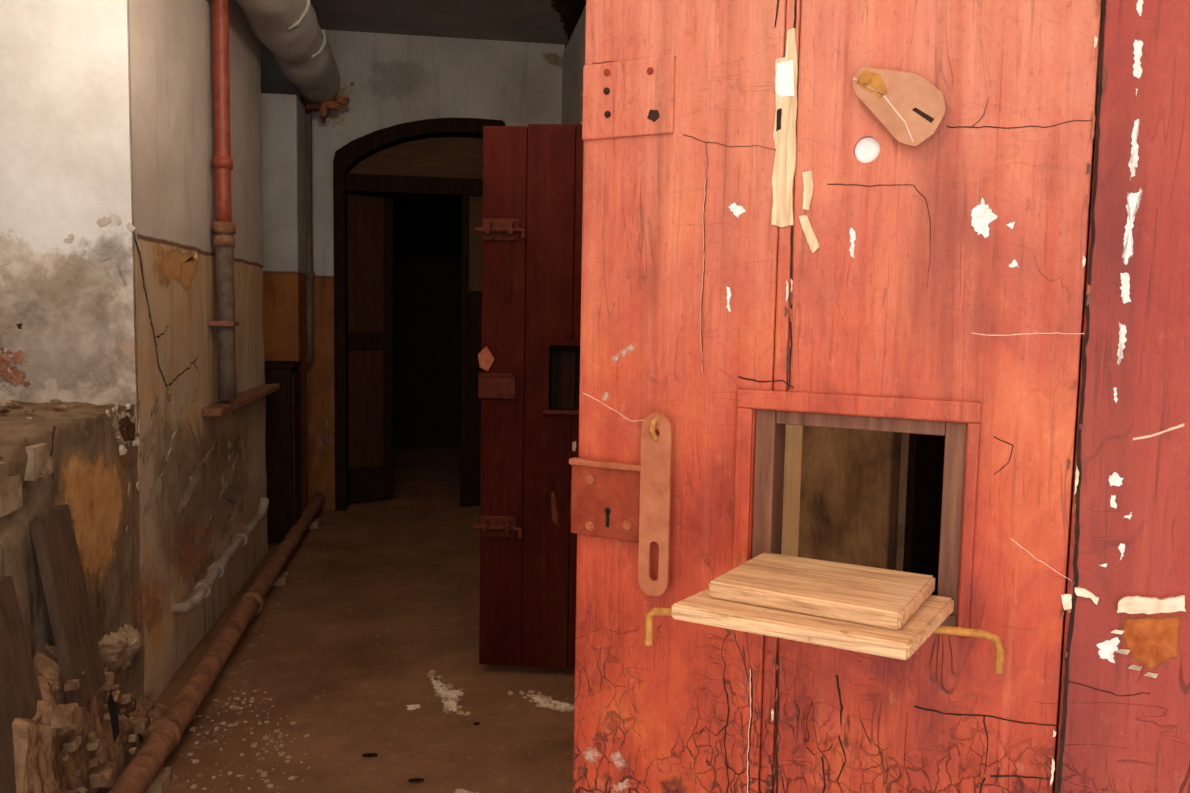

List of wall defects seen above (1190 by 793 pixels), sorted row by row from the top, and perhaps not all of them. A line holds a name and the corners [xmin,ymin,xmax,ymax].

peeling [1133,40,1143,97]
peeling [1128,119,1139,178]
peeling [971,198,1015,237]
peeling [1120,189,1142,304]
crack [134,232,200,405]
damp [127,392,258,563]
peeling [1061,581,1099,618]
peeling [1097,595,1186,678]
crack [697,669,753,793]
crack [806,675,846,793]
crack [914,705,1058,793]
crack [1069,681,1150,696]